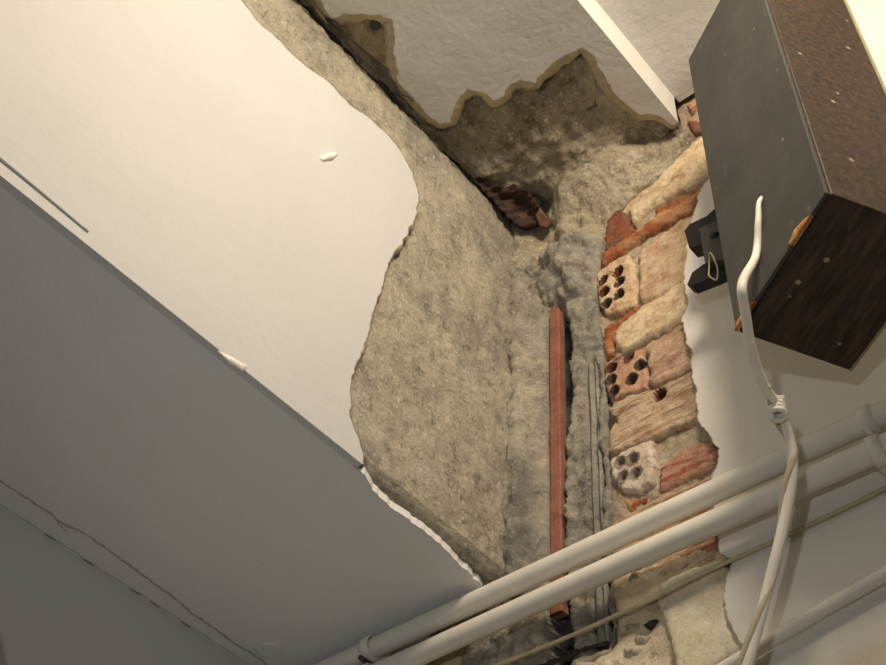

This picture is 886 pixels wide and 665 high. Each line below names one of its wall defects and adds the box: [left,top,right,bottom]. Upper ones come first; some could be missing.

corrosion [468,167,552,230]
spalling [242,0,720,587]
peeling [217,350,247,372]
crack [0,480,268,665]
flaking render [427,534,743,665]